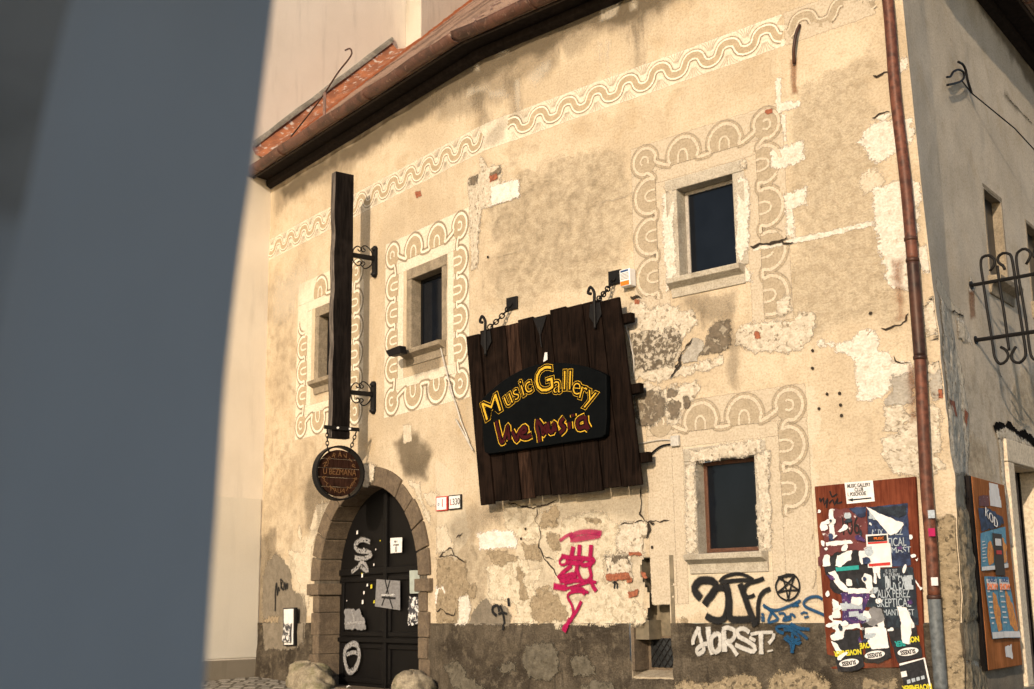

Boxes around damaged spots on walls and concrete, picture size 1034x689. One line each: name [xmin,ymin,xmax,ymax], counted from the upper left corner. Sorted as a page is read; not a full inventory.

spalling [899,55,908,73]
spalling [857,112,916,164]
spalling [467,156,521,271]
crack [750,221,874,251]
spalling [872,179,930,291]
spalling [625,186,835,427]
peeling [289,500,329,608]
peeling [409,480,653,630]
crack [509,500,562,584]
spalling [936,506,978,625]
flaking render [675,667,833,689]
spalling [947,656,989,689]